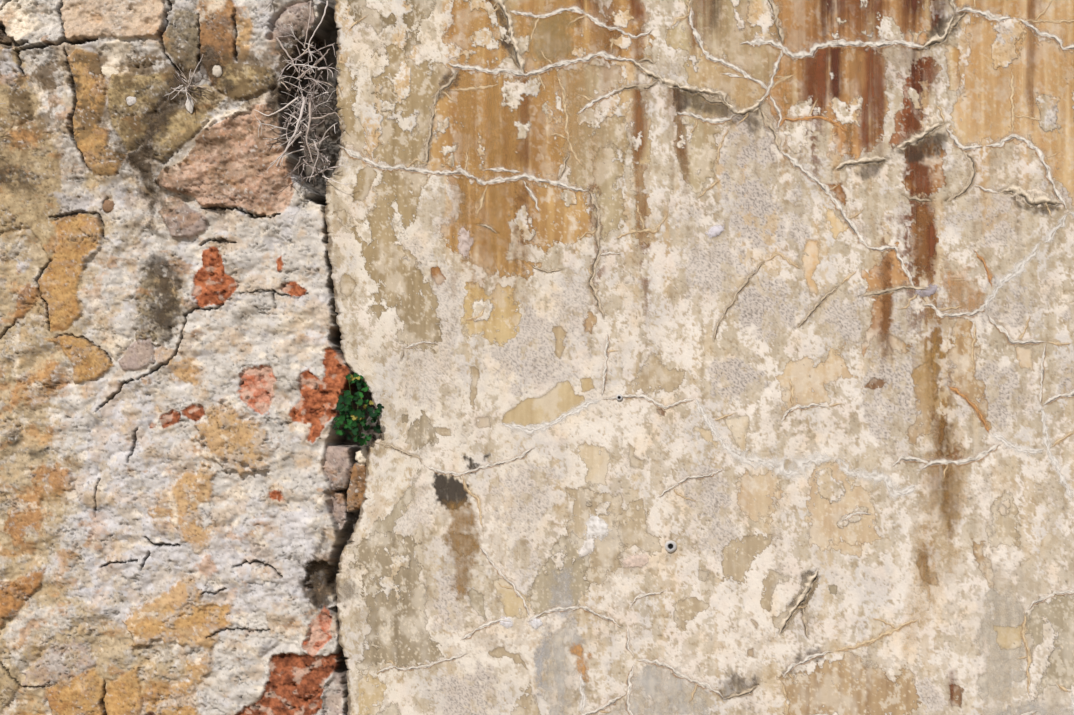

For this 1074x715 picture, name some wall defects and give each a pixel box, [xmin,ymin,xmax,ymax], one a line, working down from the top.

crack [0,0,98,166]
crack [36,269,309,411]
spalling [192,247,239,309]
spalling [289,348,357,444]
rust [634,86,644,166]
peeling [332,0,1074,359]
crack [341,0,1074,715]
rust [807,47,841,116]
rust [847,48,883,151]
rust [903,108,944,371]
damp [432,455,489,600]
spalling [238,606,344,715]